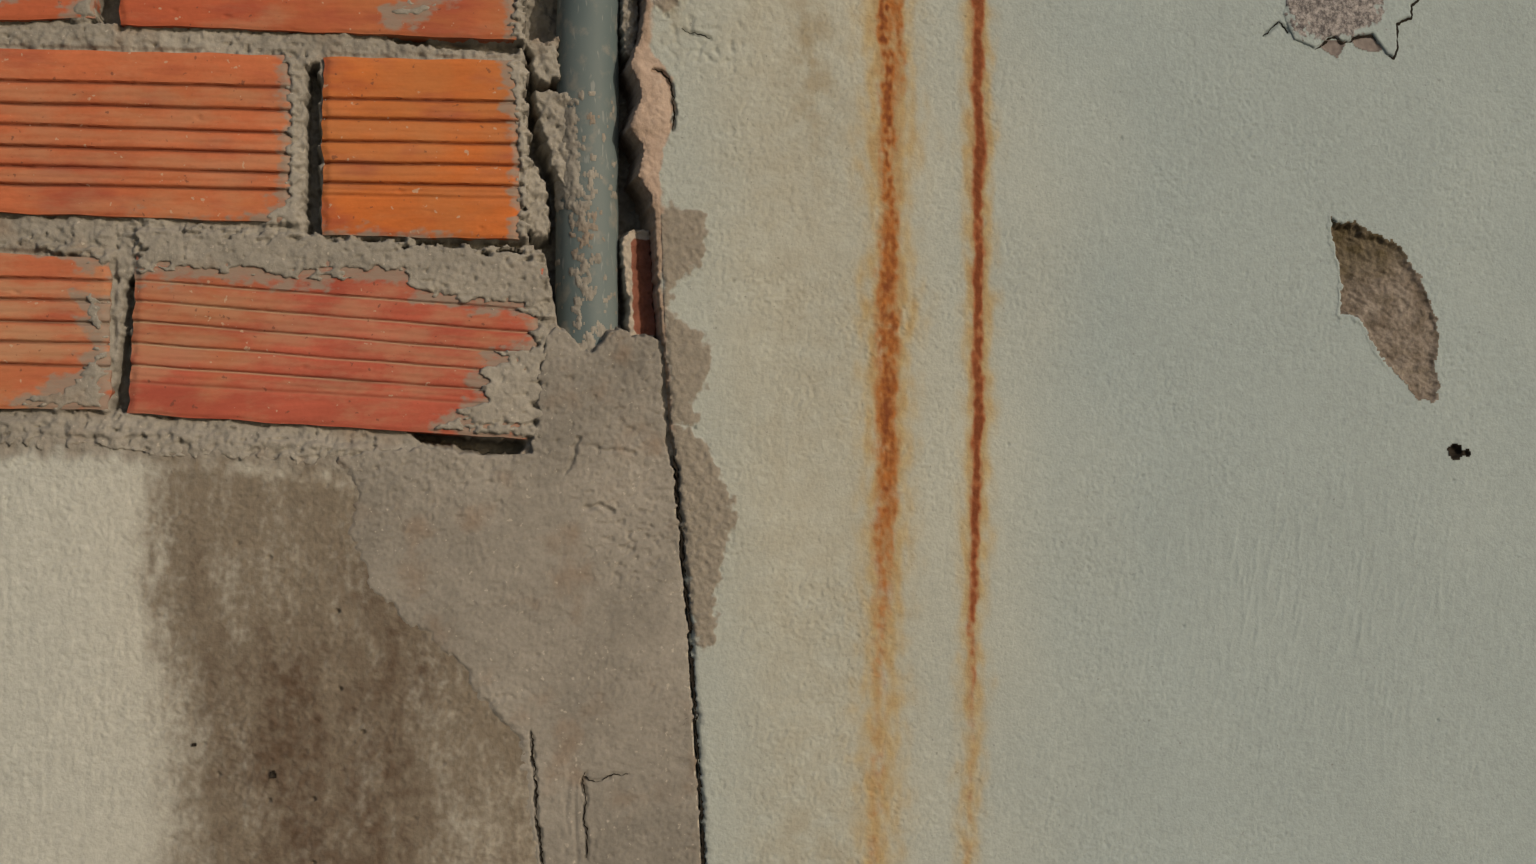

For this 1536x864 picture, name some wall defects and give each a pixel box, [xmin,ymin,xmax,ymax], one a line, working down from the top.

peeling [1283,0,1420,60]
spalling [1326,213,1441,403]
corrosion [817,0,1013,864]
spalling [1447,443,1471,460]
water stain [116,442,537,864]
crack [672,455,706,864]
crack [530,731,544,864]
crack [582,773,625,858]